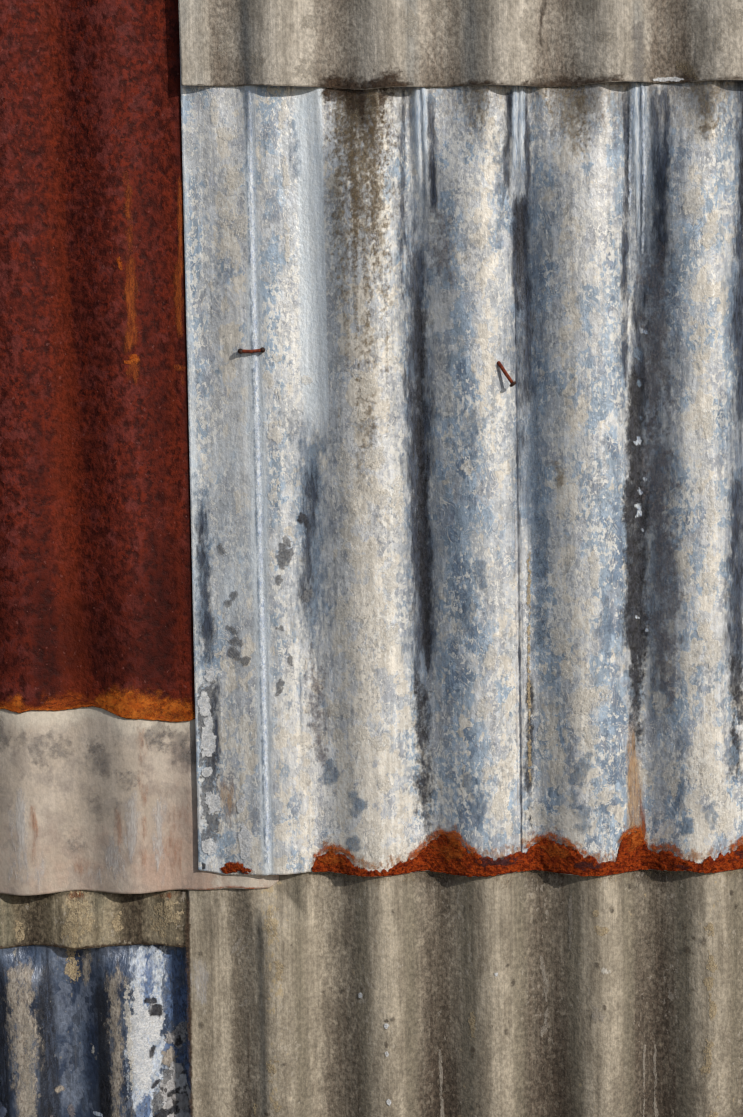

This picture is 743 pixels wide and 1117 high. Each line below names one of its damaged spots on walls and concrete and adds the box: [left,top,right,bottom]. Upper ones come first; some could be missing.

rust [117,257,139,381]
rust [174,179,182,336]
damp [324,87,455,826]
damp [494,90,550,853]
damp [601,26,743,777]
rust [0,691,195,722]
damp [183,489,221,842]
rust [311,731,743,877]
peeling [15,920,25,942]
peeling [0,964,40,1117]
peeling [59,890,95,984]
peeling [93,897,204,1117]